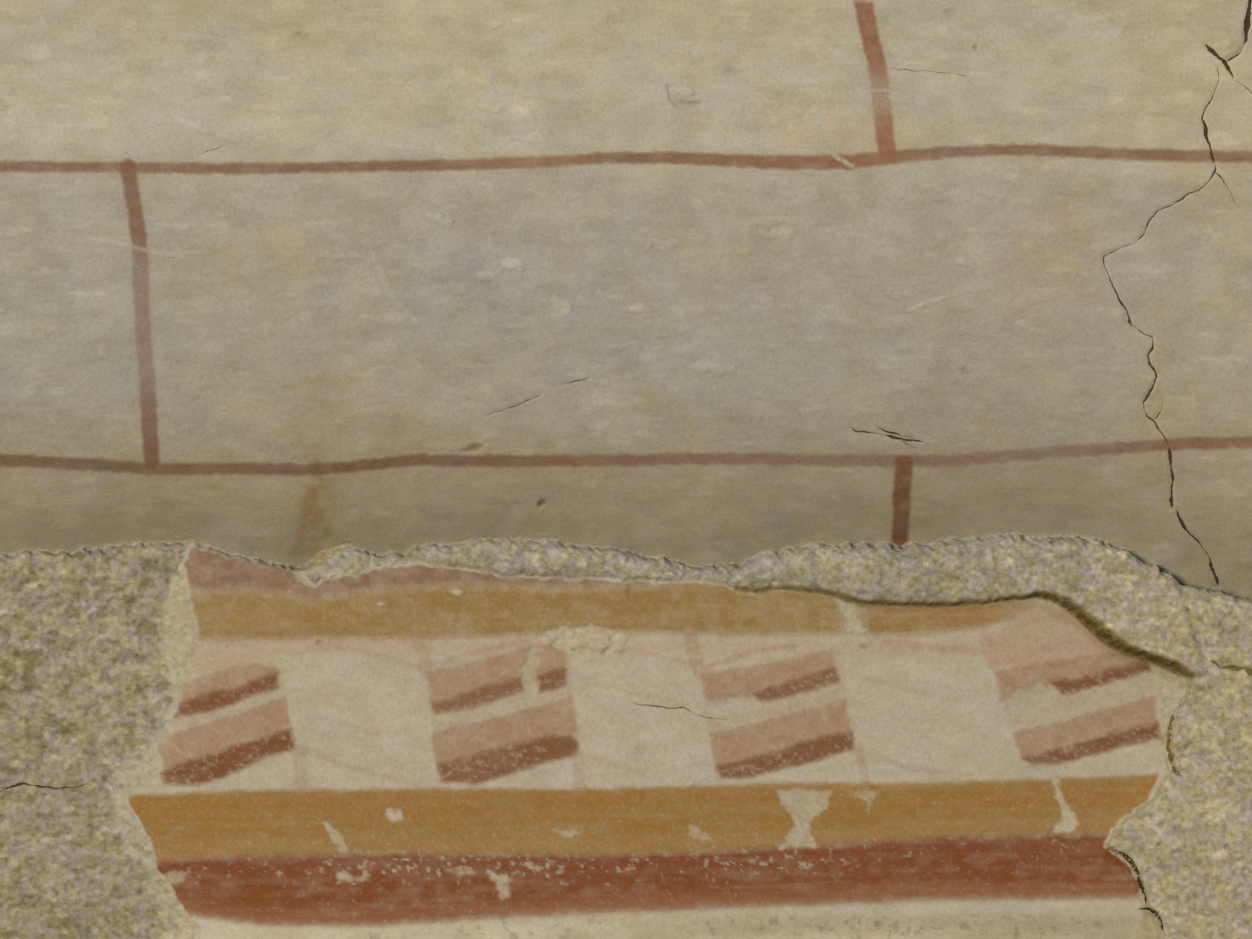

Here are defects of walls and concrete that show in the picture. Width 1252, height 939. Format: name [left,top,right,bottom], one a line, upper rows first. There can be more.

crack [1103,0,1252,585]
crack [852,428,923,447]
peeling [286,565,315,589]
spalling [0,540,220,939]
spalling [373,534,1252,939]
crack [0,782,85,792]
peeling [324,821,350,852]
peeling [336,868,369,882]